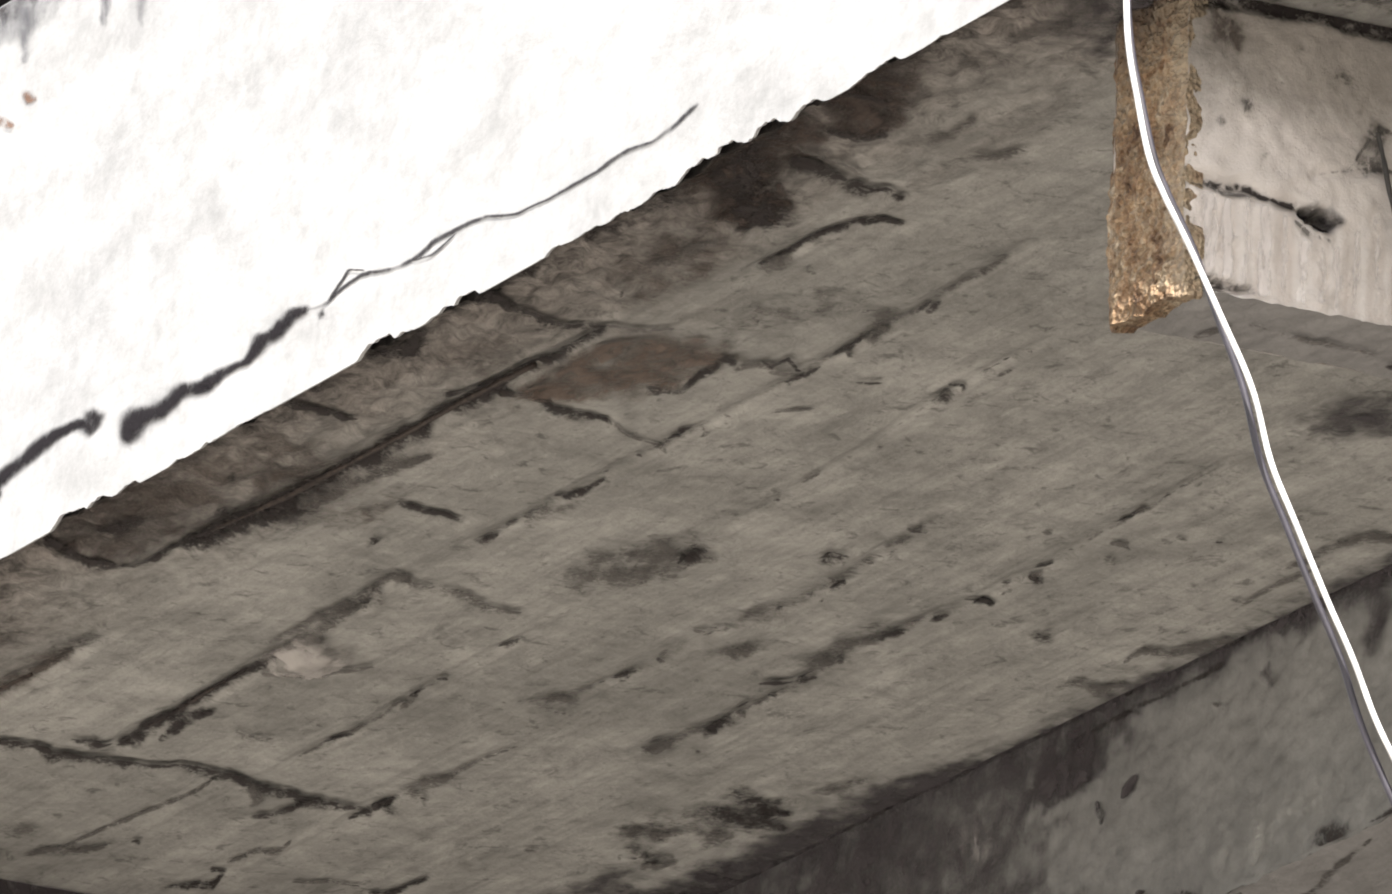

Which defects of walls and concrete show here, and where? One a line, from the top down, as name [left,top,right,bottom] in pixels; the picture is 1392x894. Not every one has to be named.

crack [758,151,904,273]
crack [1194,180,1294,211]
crack [1332,124,1392,174]
crack [0,105,696,496]
damp [566,532,1392,894]
damp [0,879,82,894]
damp [26,843,111,856]
crack [0,739,516,894]